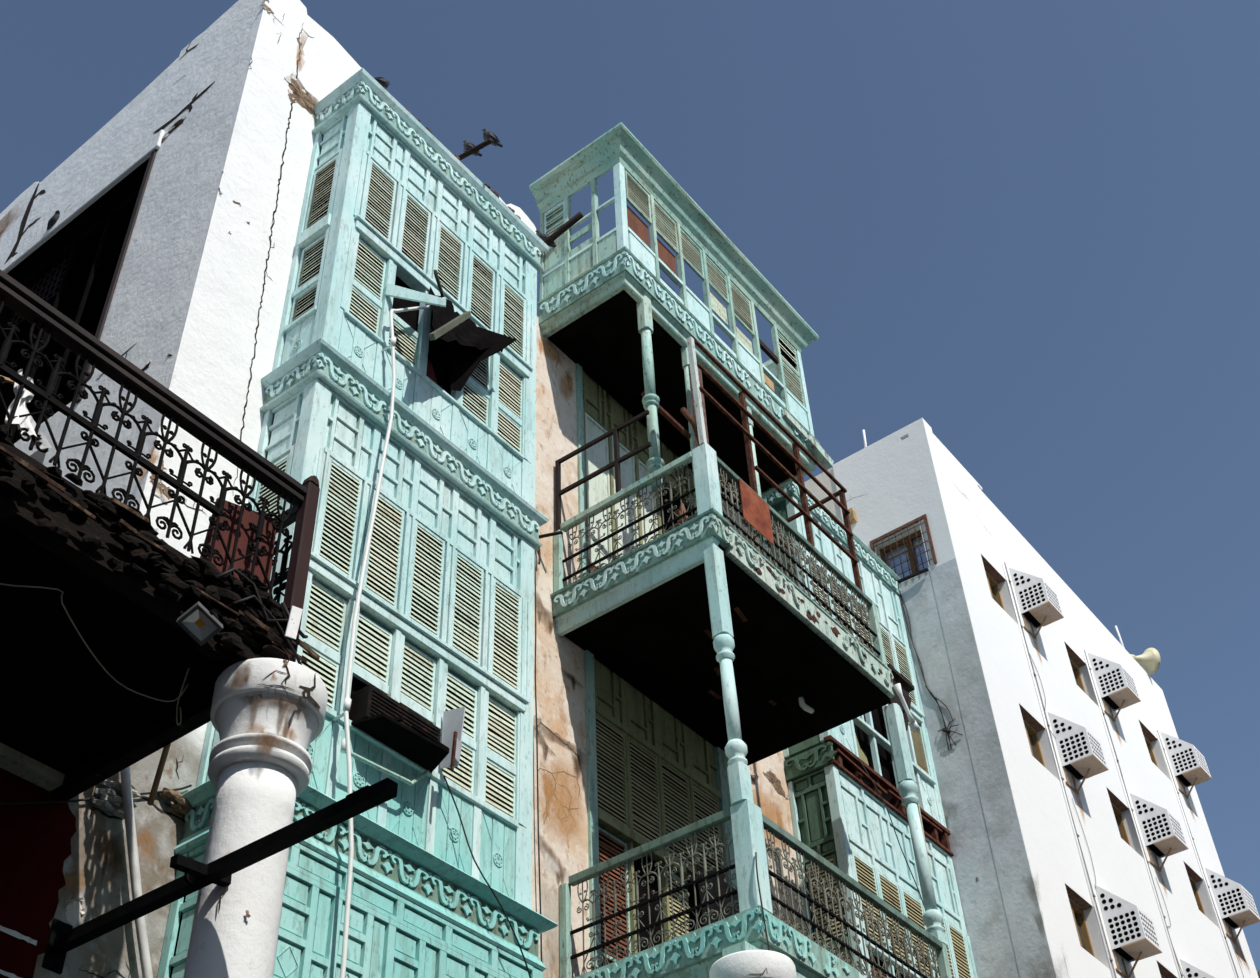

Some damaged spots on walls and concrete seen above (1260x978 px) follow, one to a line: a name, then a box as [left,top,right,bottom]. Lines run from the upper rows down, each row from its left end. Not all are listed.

crack [153,41,215,134]
spalling [284,74,317,119]
crack [234,14,314,487]
peeling [150,460,172,502]
crack [258,651,320,708]
leakage [545,854,563,883]
peeling [66,897,85,927]